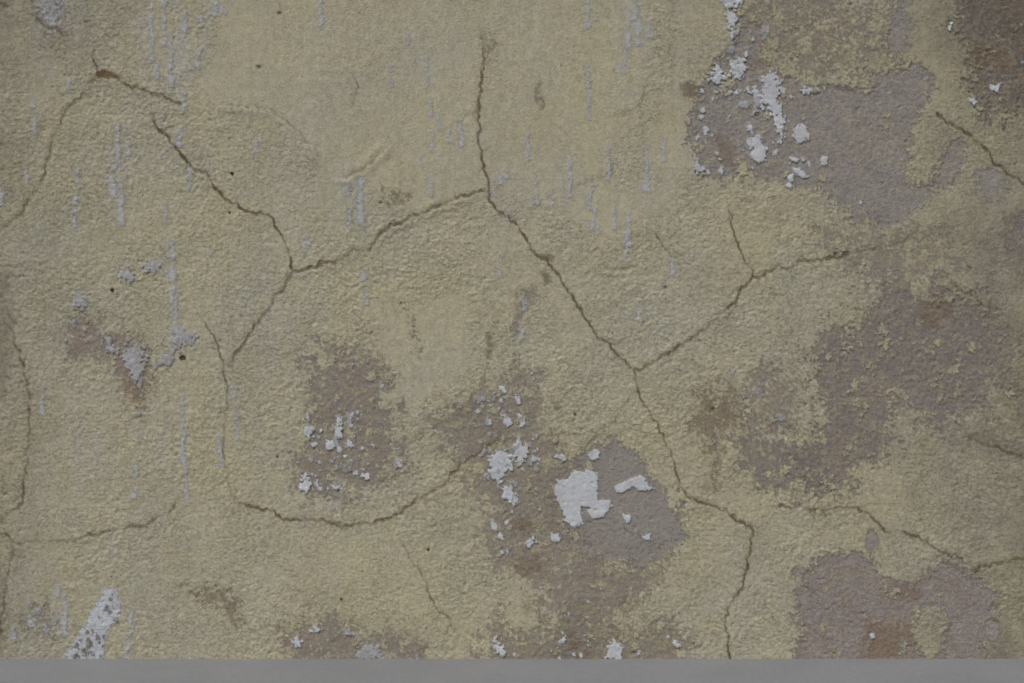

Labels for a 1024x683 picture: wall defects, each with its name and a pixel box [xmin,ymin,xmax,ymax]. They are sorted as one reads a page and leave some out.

crack [936,113,1024,184]
crack [4,53,860,437]
spalling [681,0,1024,514]
peeling [63,291,199,418]
crack [1,462,28,574]
crack [62,504,175,541]
crack [244,439,498,526]
spalling [276,335,702,659]
crack [674,463,754,659]
crack [779,504,1023,573]
peeling [5,587,124,659]